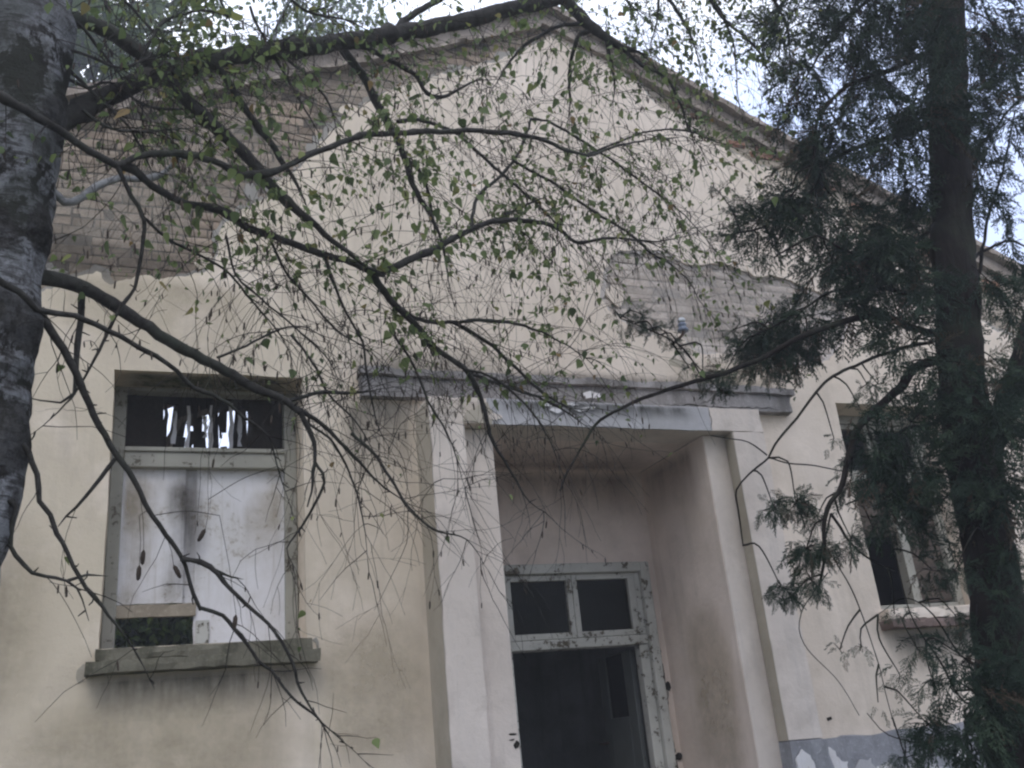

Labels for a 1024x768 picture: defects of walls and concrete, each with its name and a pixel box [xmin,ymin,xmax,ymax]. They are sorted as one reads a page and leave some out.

flaking render [45,29,552,285]
flaking render [600,250,847,368]
damp [175,485,195,547]
peeling [795,749,816,768]
peeling [828,747,946,768]